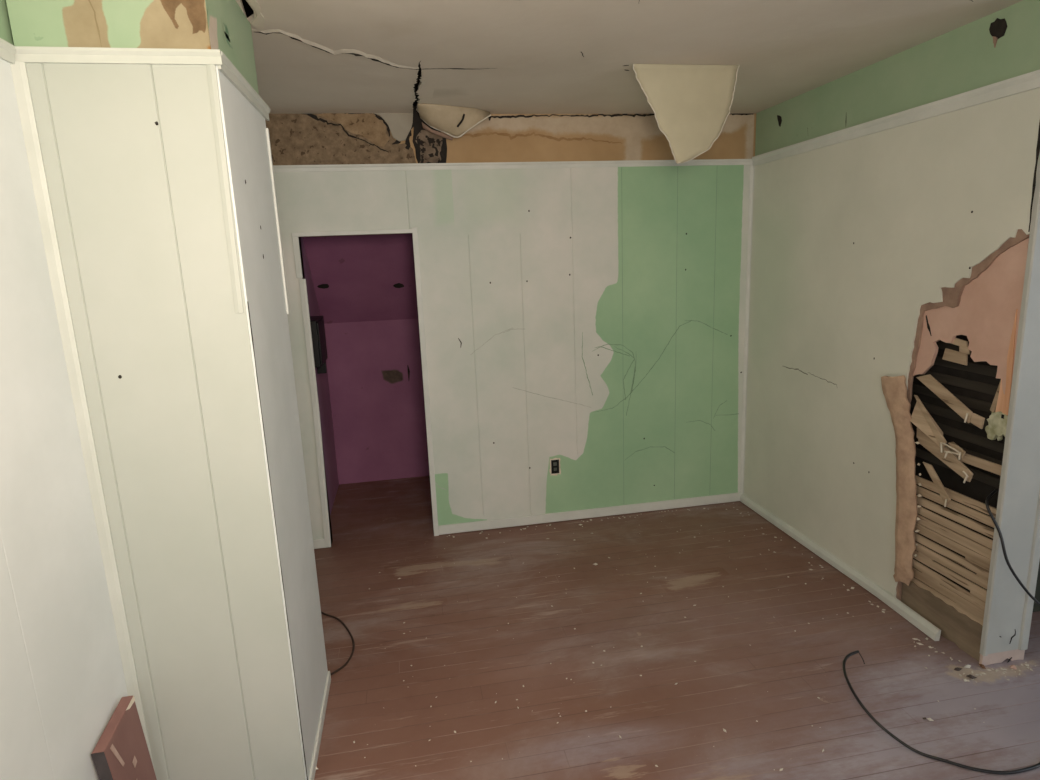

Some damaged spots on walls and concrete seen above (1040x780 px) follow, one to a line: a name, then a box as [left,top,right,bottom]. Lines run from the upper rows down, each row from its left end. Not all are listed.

peeling [55,0,117,48]
peeling [130,0,220,49]
crack [252,29,495,113]
spalling [989,18,1007,48]
flaking render [265,103,491,230]
crack [1028,122,1040,232]
peeling [542,165,816,514]
spalling [881,229,1029,661]
peeling [435,470,491,525]